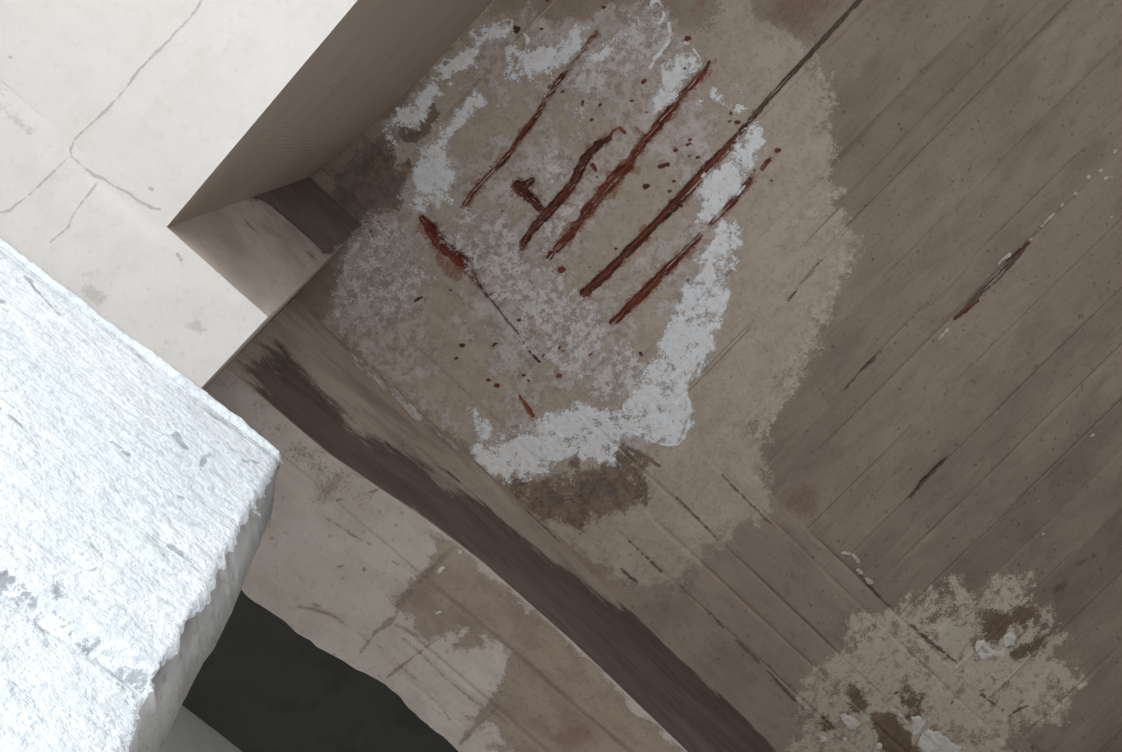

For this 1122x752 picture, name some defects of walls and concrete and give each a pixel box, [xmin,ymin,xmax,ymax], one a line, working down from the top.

rust [658,138,700,193]
water stain [236,0,1090,752]
peeling [975,603,1050,662]
peeling [815,679,967,752]